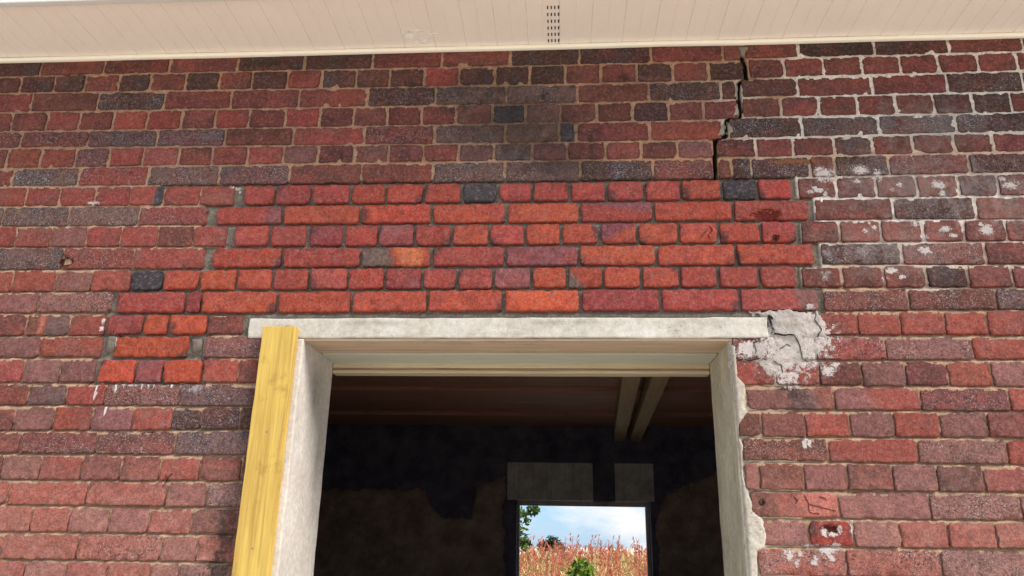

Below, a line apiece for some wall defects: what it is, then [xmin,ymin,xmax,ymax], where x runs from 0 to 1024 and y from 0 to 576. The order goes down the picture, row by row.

crack [709,56,756,180]
damp [807,166,836,197]
damp [853,166,902,191]
damp [911,221,932,256]
damp [978,222,993,235]
spalling [727,309,827,381]